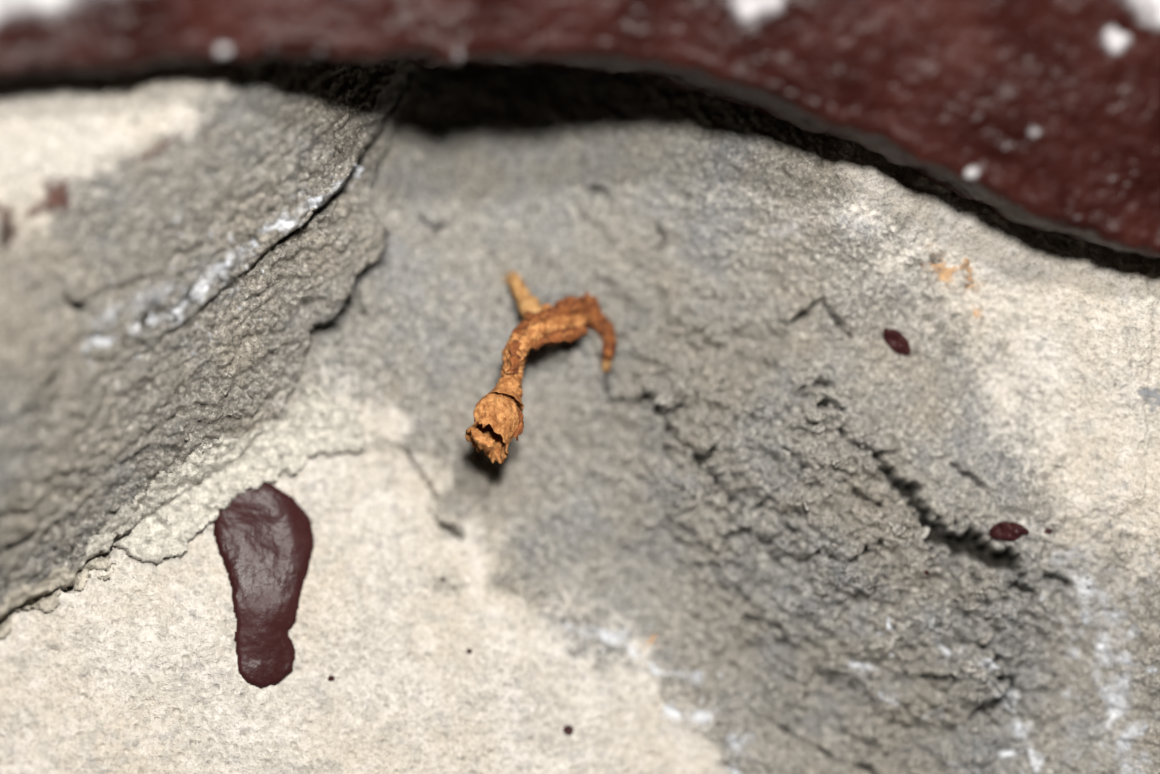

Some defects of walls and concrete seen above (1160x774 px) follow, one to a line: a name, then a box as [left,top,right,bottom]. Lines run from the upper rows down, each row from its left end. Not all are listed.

crack [284,73,410,238]
damp [84,337,112,352]
damp [172,196,322,322]
crack [310,233,386,334]
spalling [624,382,678,446]
peeling [0,381,366,639]
spalling [767,425,930,626]
crack [798,380,1068,607]
spalling [901,584,1003,723]